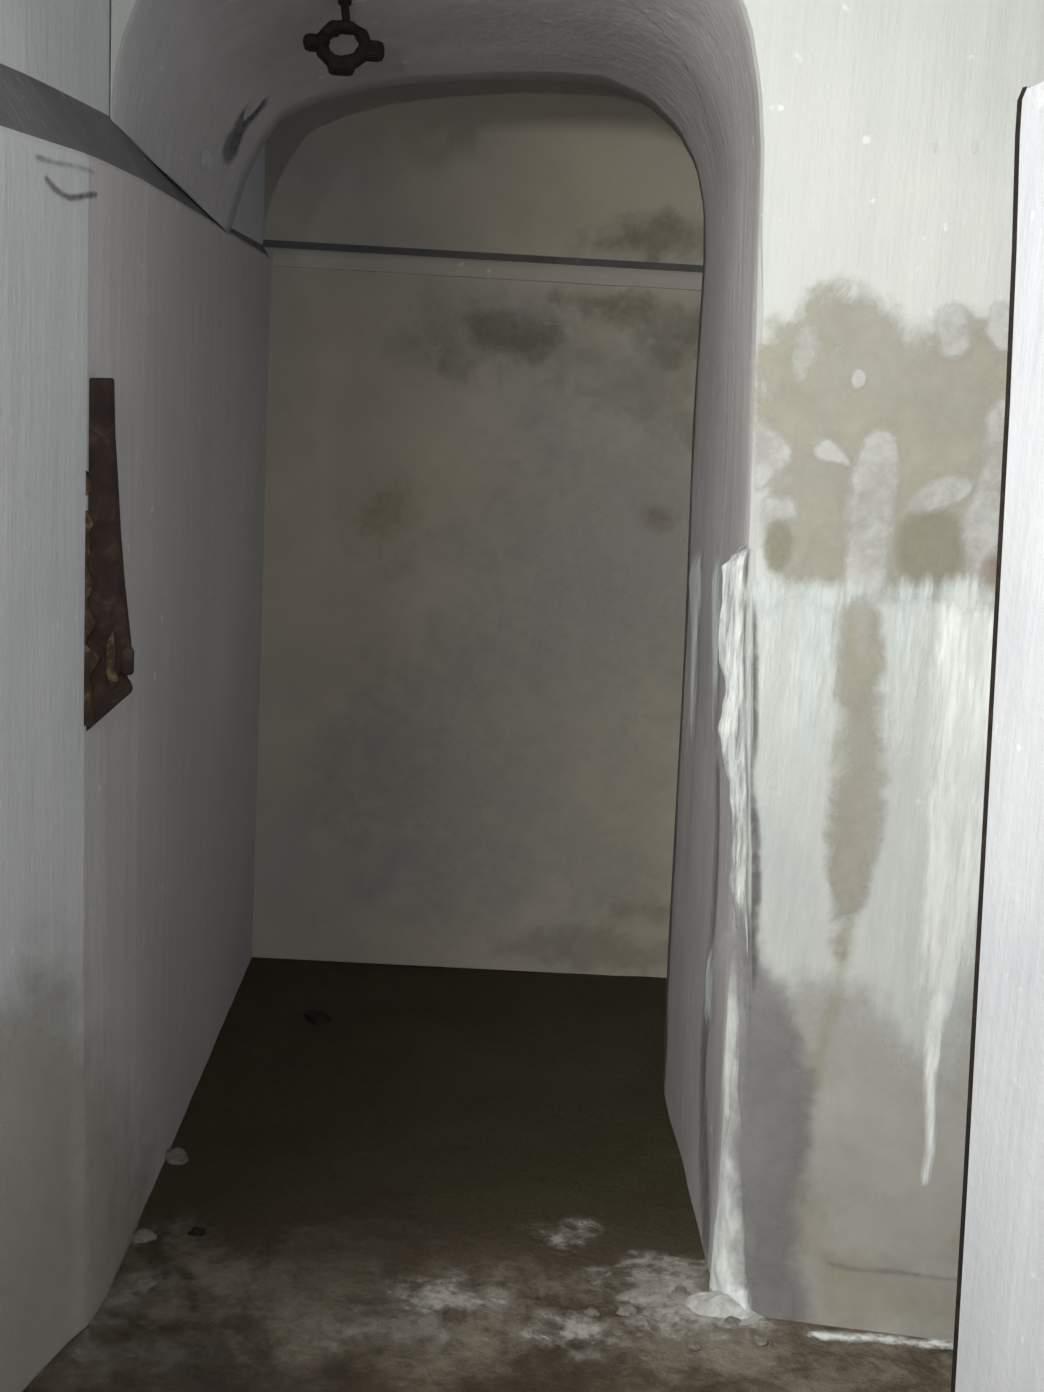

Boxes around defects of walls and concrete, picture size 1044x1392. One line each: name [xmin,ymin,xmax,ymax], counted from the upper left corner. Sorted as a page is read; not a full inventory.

peeling [754,287,1009,604]
damp [622,545,995,1349]
damp [550,1221,587,1245]
damp [541,1314,602,1339]